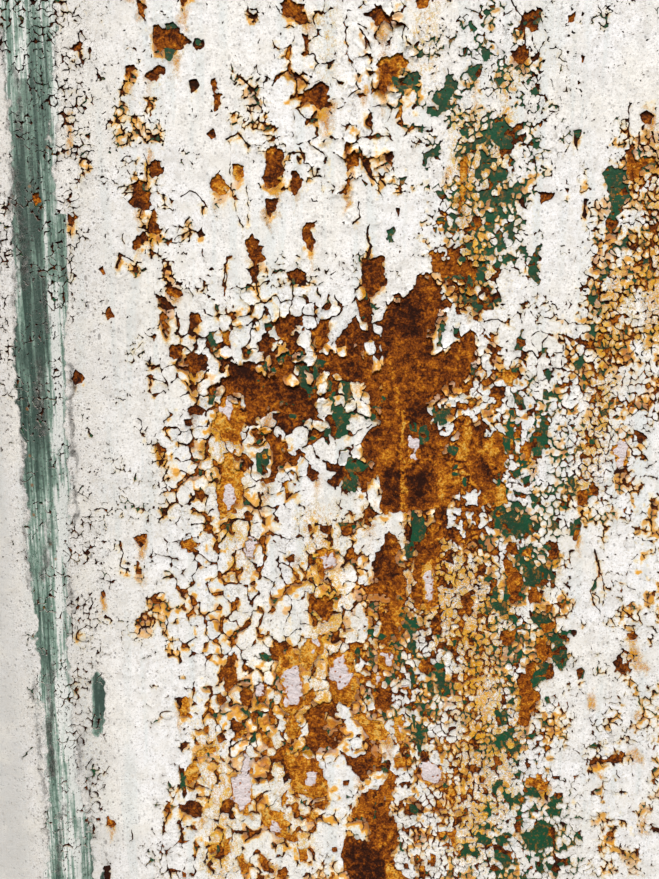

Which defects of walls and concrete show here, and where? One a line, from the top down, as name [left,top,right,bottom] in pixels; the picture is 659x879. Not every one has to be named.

crack [510,0,531,67]
peeling [561,0,635,38]
peeling [0,0,101,323]
crack [180,190,208,257]
crack [360,154,382,195]
corrosion [575,226,659,489]
corrosion [217,106,522,879]
crack [590,549,609,611]
peeling [569,571,659,796]
peeling [27,646,116,870]
corrosion [190,732,240,879]
peeling [281,771,358,876]